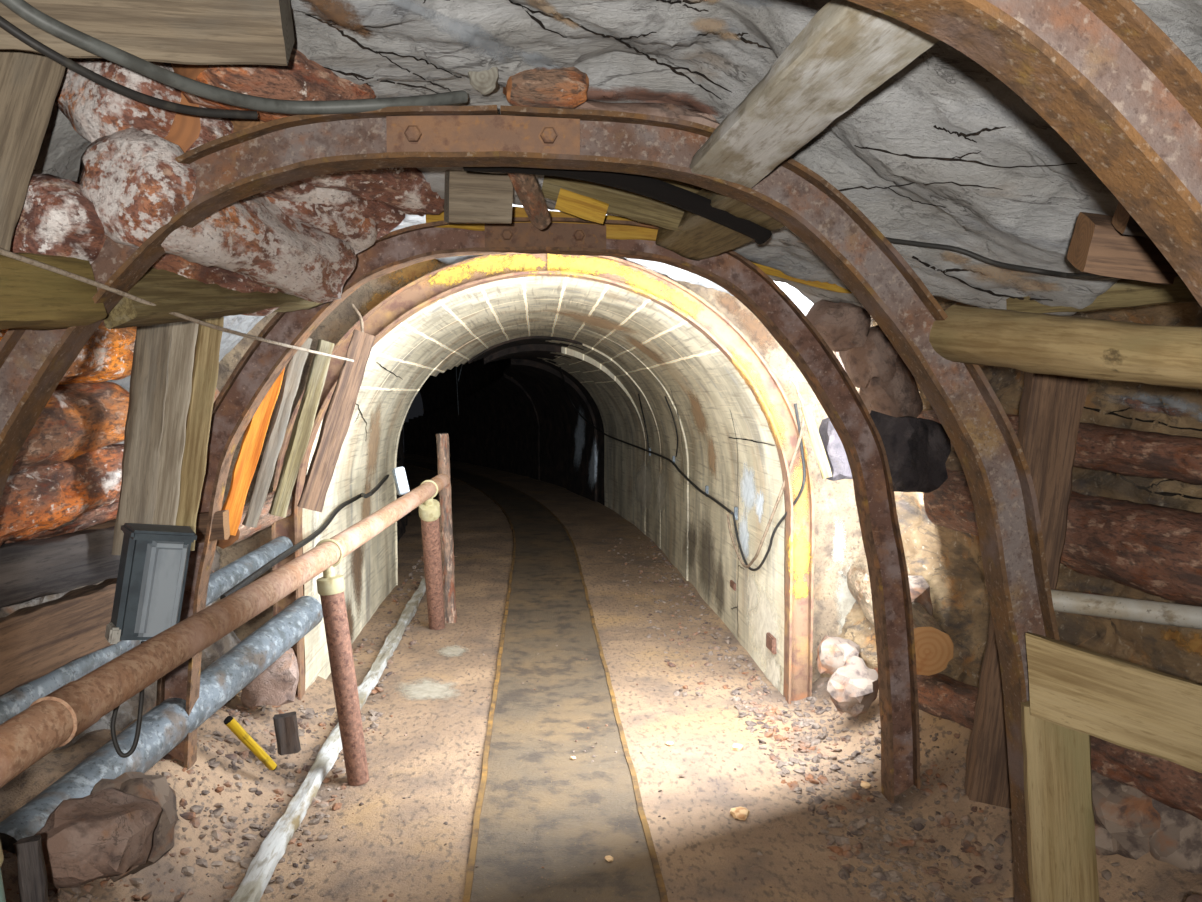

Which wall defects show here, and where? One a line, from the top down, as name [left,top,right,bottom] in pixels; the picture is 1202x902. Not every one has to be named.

rust [303,0,372,37]
crack [305,14,462,93]
crack [509,0,731,100]
crack [656,0,772,50]
rust [587,88,717,115]
crack [839,125,1077,208]
rust [358,259,441,316]
rust [716,293,777,352]
crack [912,256,1053,301]
rust [363,415,380,519]
rust [791,436,810,527]
rust [347,545,365,641]